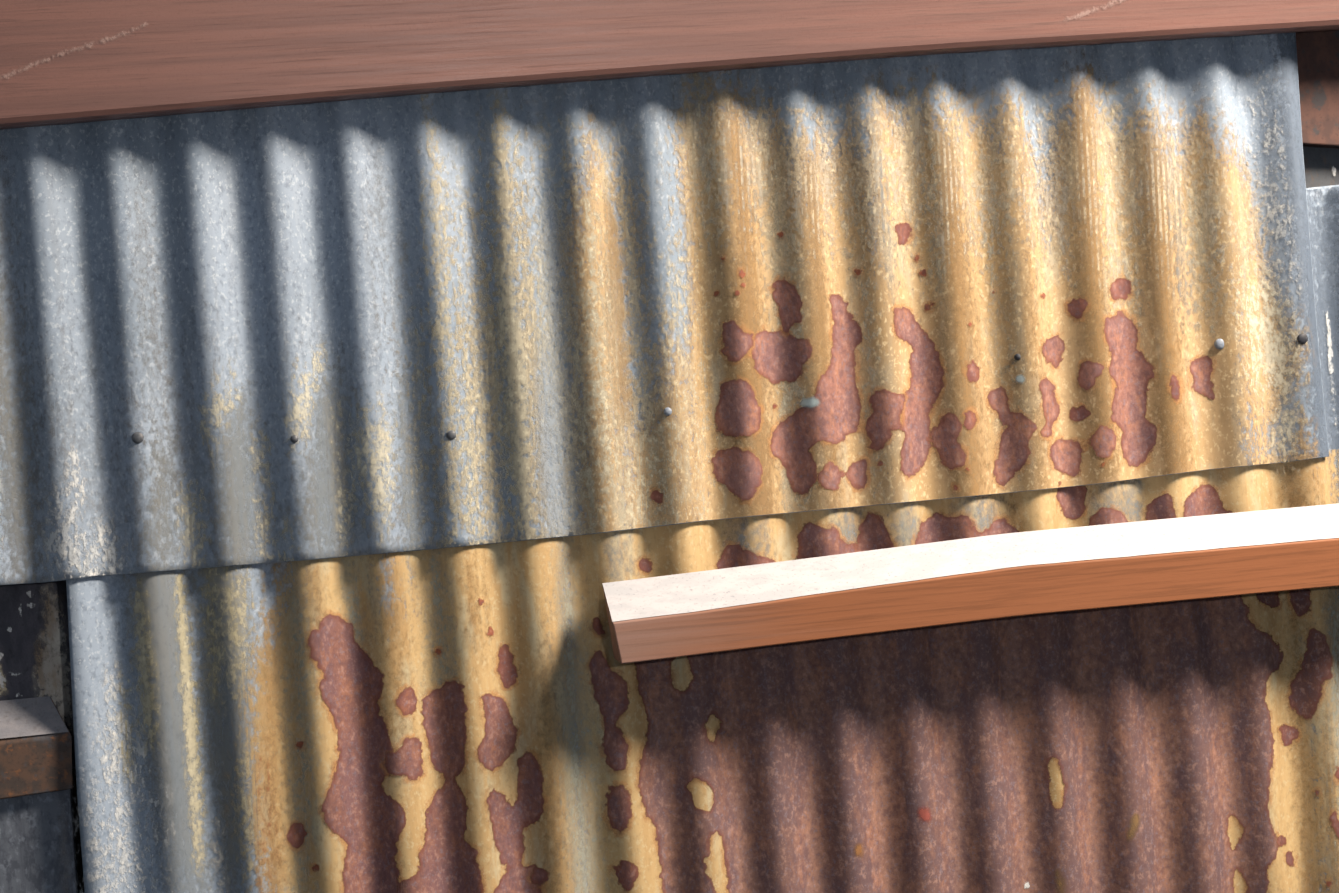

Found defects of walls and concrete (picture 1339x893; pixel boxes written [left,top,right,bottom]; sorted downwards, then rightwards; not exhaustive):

corrosion [174,574,205,868]
corrosion [201,64,1339,893]